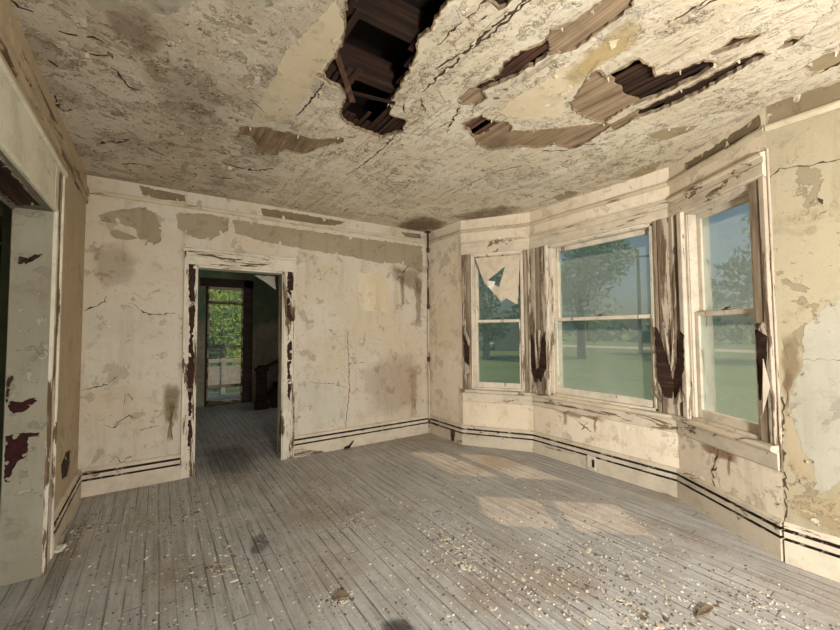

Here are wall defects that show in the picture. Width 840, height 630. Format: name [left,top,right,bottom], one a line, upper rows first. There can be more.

peeling [191,0,453,190]
crack [346,0,531,175]
flaking render [455,0,762,182]
flaking render [0,156,40,206]
peeling [91,125,207,202]
crack [770,159,839,178]
peeling [95,207,162,247]
peeling [174,182,423,272]
peeling [6,375,37,413]
peeling [3,432,40,483]
peeling [84,264,197,450]
peeling [785,298,840,533]